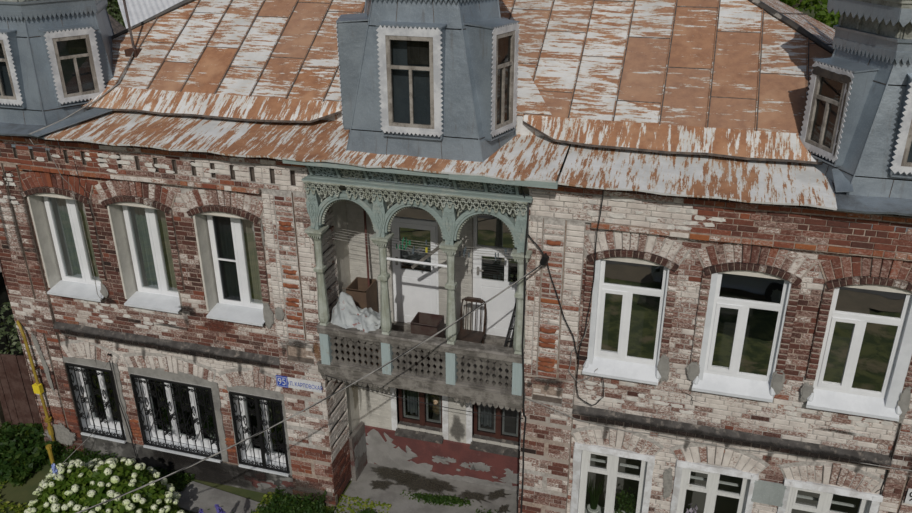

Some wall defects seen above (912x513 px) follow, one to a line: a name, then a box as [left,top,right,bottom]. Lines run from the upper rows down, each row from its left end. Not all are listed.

peeling [354,429,519,492]